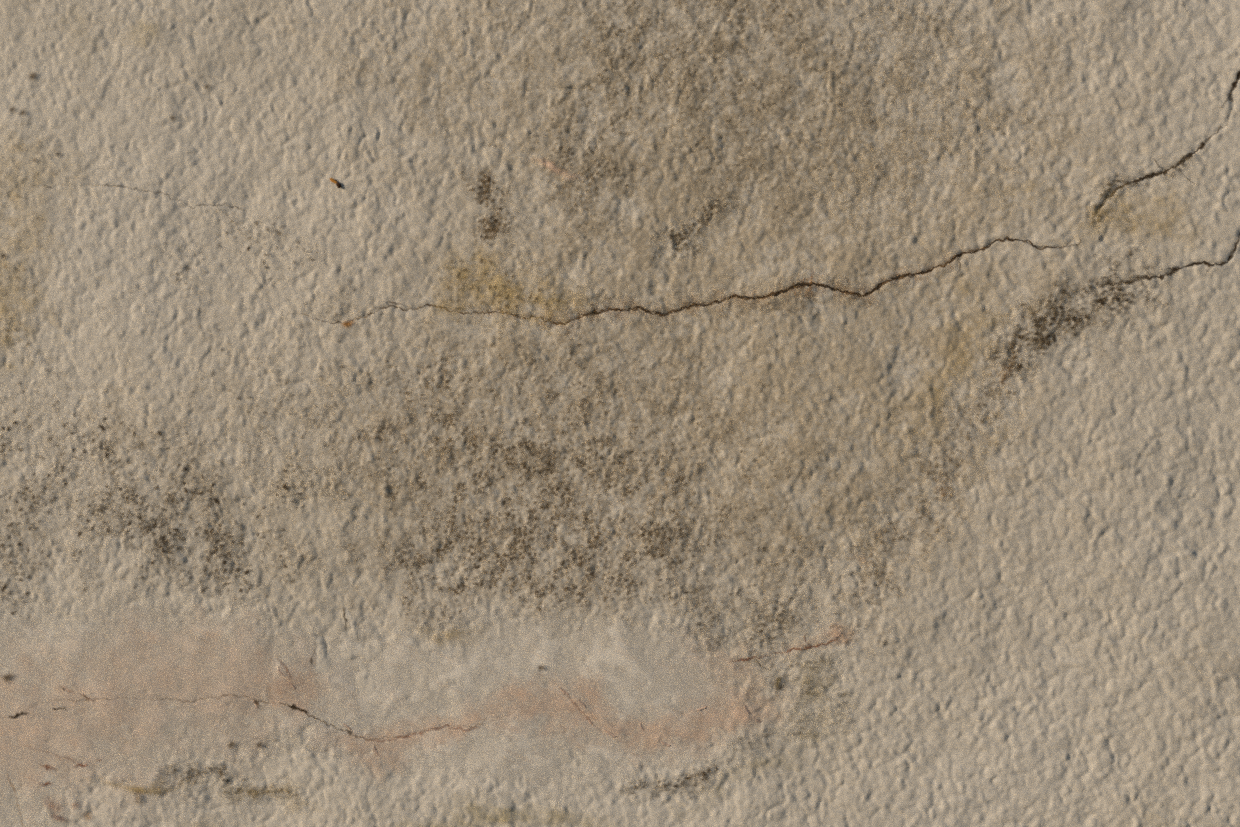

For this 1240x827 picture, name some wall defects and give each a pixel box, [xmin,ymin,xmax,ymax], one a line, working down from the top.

crack [1094,71,1240,217]
water stain [478,175,490,203]
water stain [482,208,505,238]
crack [332,237,1057,326]
crack [1102,233,1240,286]
water stain [994,273,1127,369]
water stain [78,509,249,592]
crack [9,687,88,718]
crack [289,704,351,733]